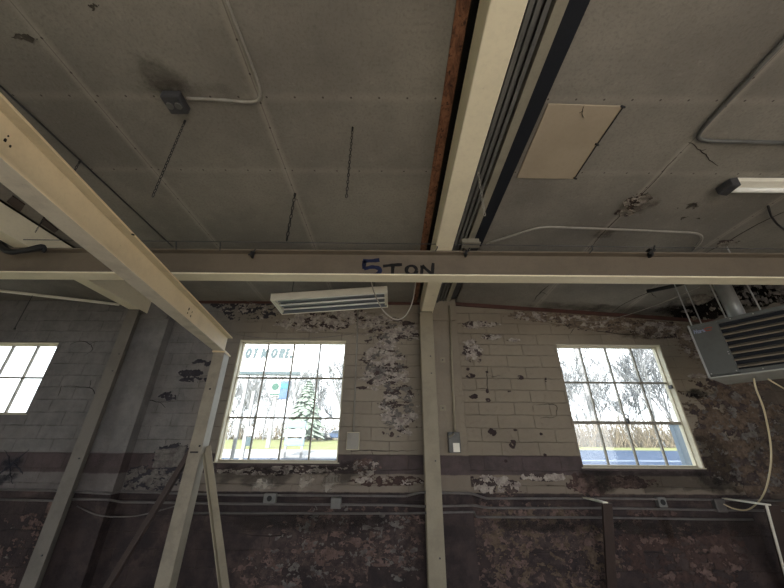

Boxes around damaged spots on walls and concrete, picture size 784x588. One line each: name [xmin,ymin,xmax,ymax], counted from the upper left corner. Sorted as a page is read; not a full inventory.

peeling [178,359,211,383]
peeling [210,303,421,437]
spalling [123,443,188,495]
peeling [216,458,424,487]
spalling [678,374,784,499]
flaking render [231,506,425,588]
flaking render [470,473,659,588]